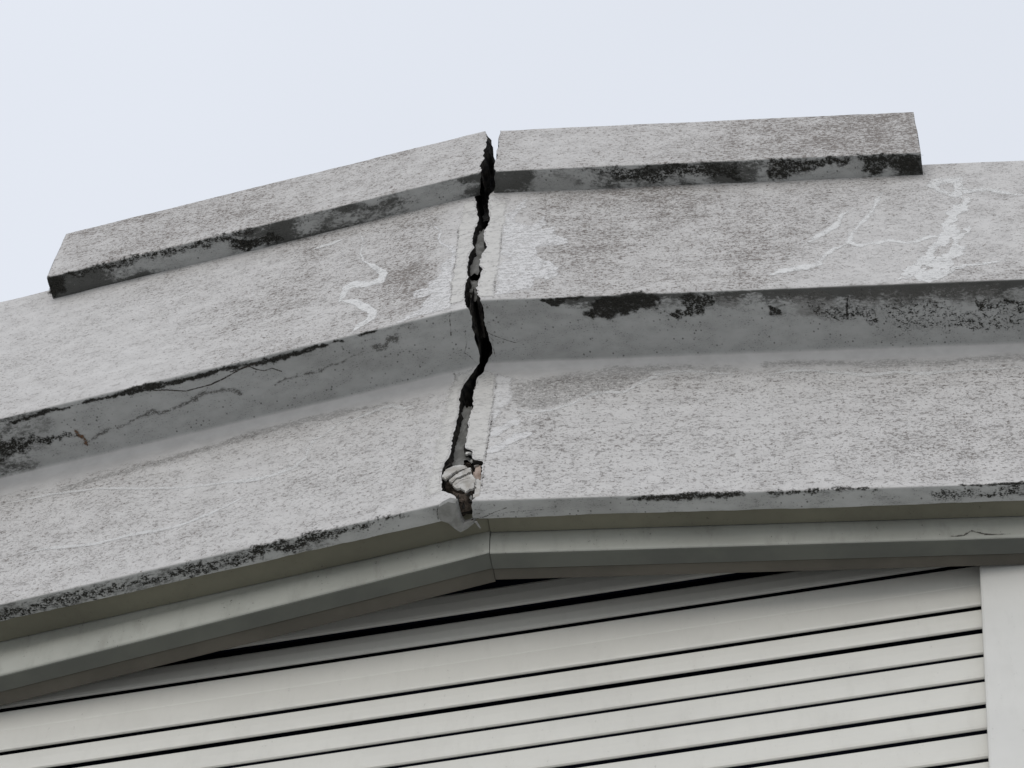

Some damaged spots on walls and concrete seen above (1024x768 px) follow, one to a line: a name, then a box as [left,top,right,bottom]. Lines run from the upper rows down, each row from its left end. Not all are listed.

water stain [586,162,741,183]
water stain [766,153,1020,283]
water stain [339,236,398,351]
water stain [540,291,715,319]
water stain [0,340,344,464]
crack [154,363,282,392]
crack [436,195,519,519]
spalling [438,452,482,532]
water stain [629,491,744,501]
water stain [768,487,876,495]
water stain [931,481,1024,500]
water stain [0,515,401,620]